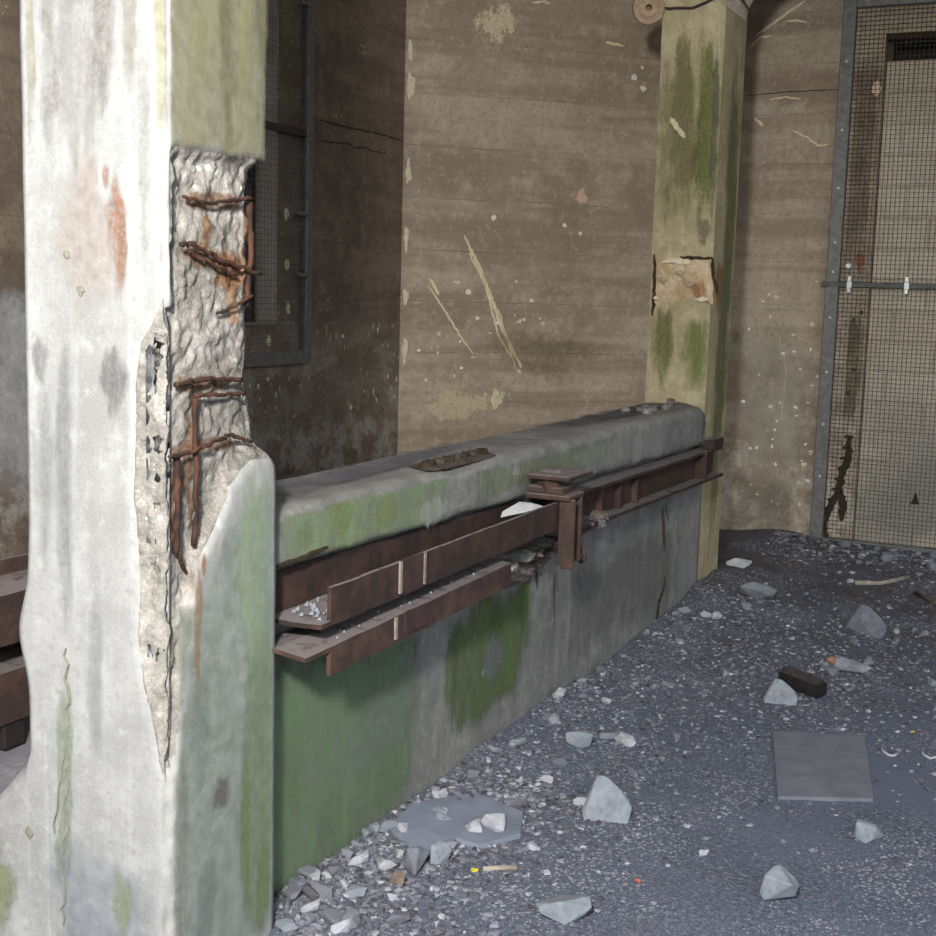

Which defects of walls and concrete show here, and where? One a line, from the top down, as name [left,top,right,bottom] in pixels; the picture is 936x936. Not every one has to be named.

crack [316,119,404,154]
damp [670,54,719,200]
corrosion [109,186,125,275]
corrosion [214,247,246,324]
spalling [651,254,718,347]
spalling [134,146,290,782]
spalling [492,536,558,589]
spalling [581,510,608,538]
crack [656,520,677,619]
crack [824,435,854,537]
corrosion [190,556,205,681]